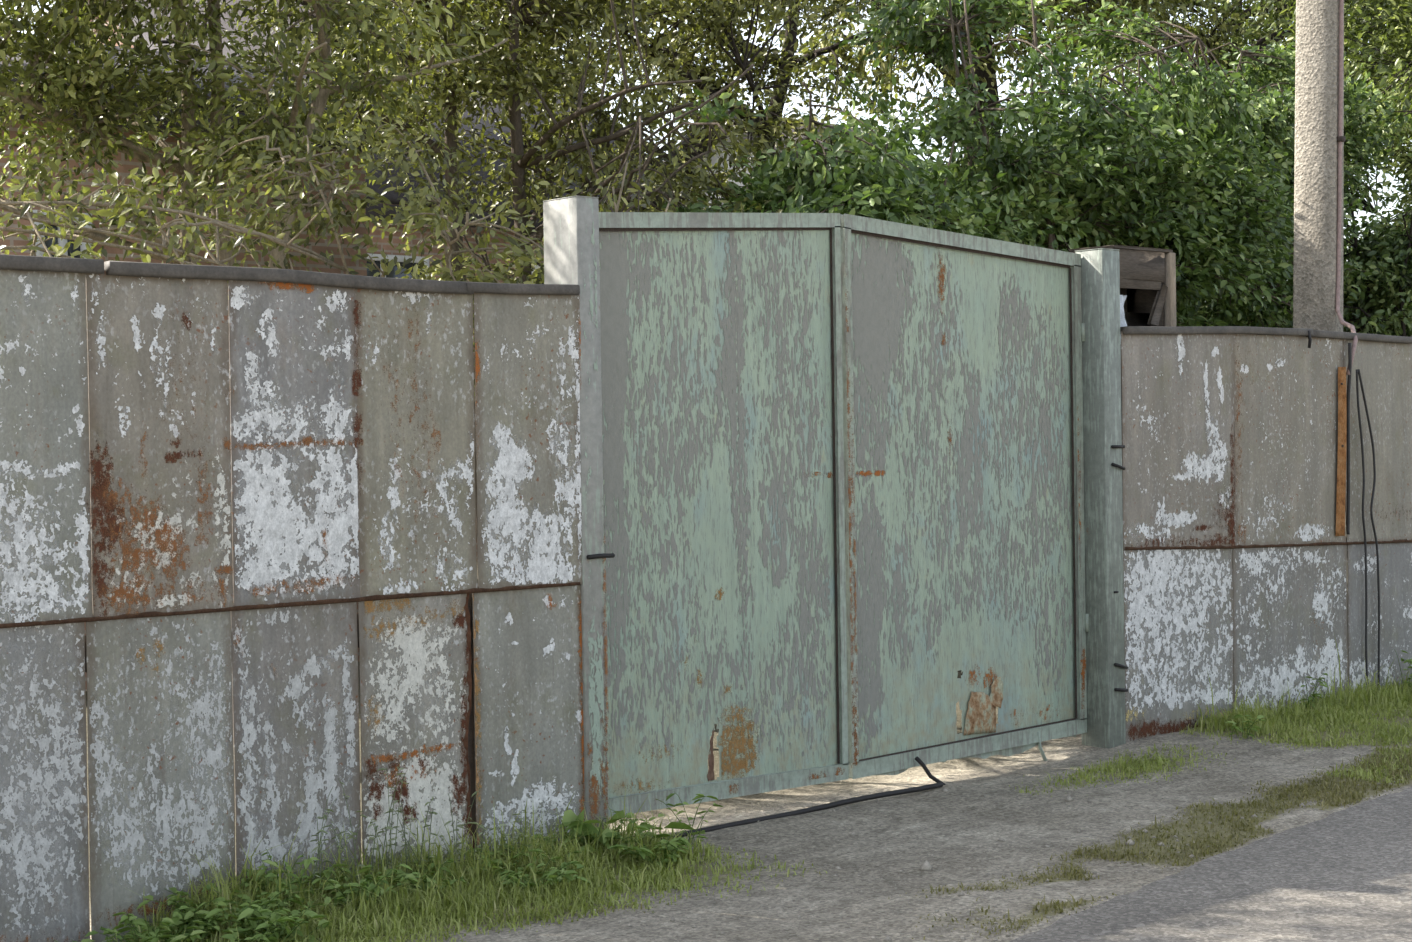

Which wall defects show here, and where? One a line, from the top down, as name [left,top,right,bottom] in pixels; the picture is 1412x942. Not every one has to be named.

corrosion [87,354,234,624]
corrosion [248,531,355,596]
peeling [0,221,833,933]
corrosion [364,598,482,849]
corrosion [718,685,758,794]
peeling [851,233,1073,758]
corrosion [965,664,997,689]
peeling [1124,334,1412,714]